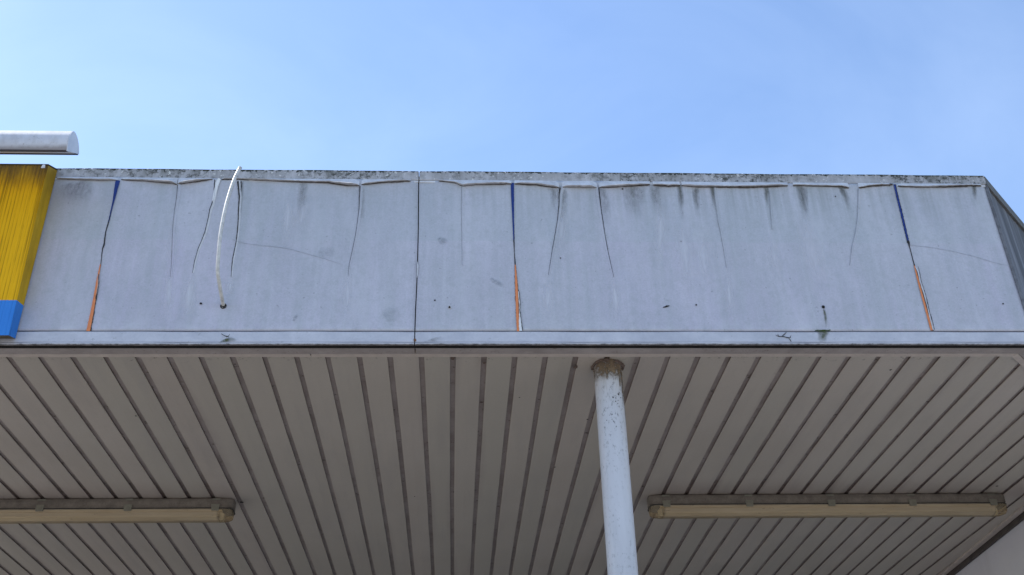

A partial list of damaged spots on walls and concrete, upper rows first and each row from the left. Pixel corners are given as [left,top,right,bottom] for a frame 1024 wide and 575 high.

crack [170,178,242,277]
crack [348,185,364,275]
crack [548,187,565,275]
crack [595,187,614,277]